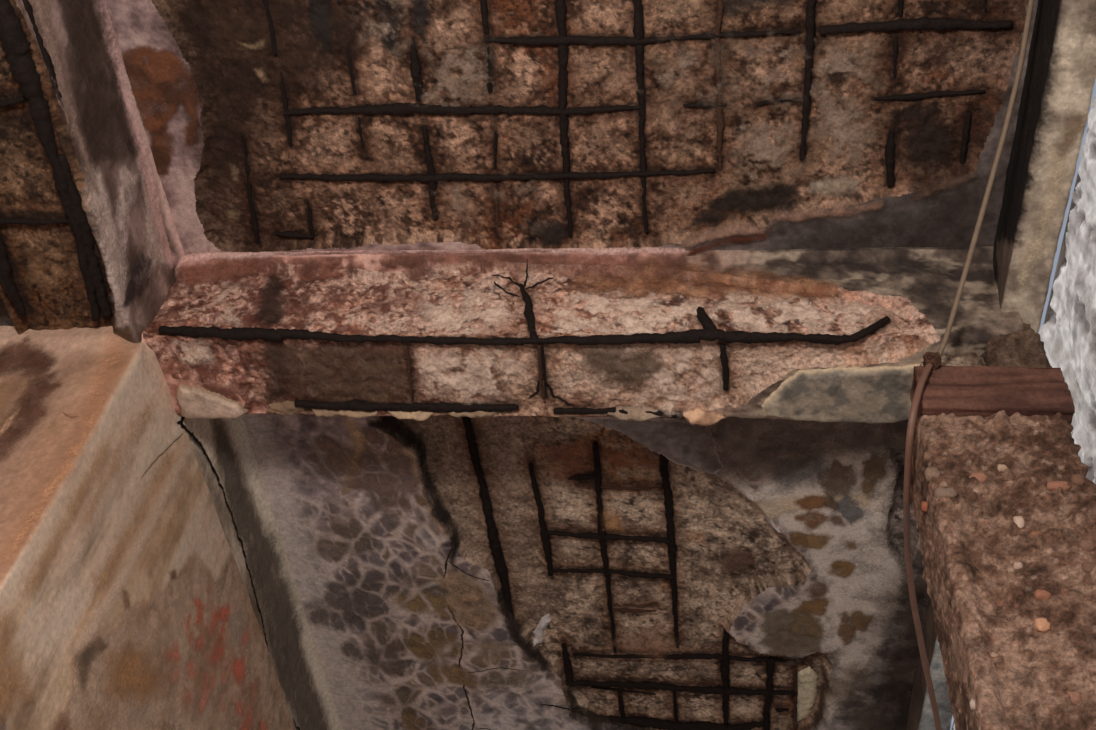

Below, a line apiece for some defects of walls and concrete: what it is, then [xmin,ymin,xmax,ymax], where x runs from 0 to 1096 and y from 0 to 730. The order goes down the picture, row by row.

damp [0,338,60,460]
spalling [0,0,118,335]
corrosion [122,46,199,176]
crack [141,416,300,730]
corrosion [175,259,341,398]
damp [214,421,534,730]
corrosion [364,283,389,313]
crack [346,416,654,730]
crack [492,259,553,332]
spalling [142,259,940,730]
spalling [151,0,1028,256]
crack [783,655,830,730]